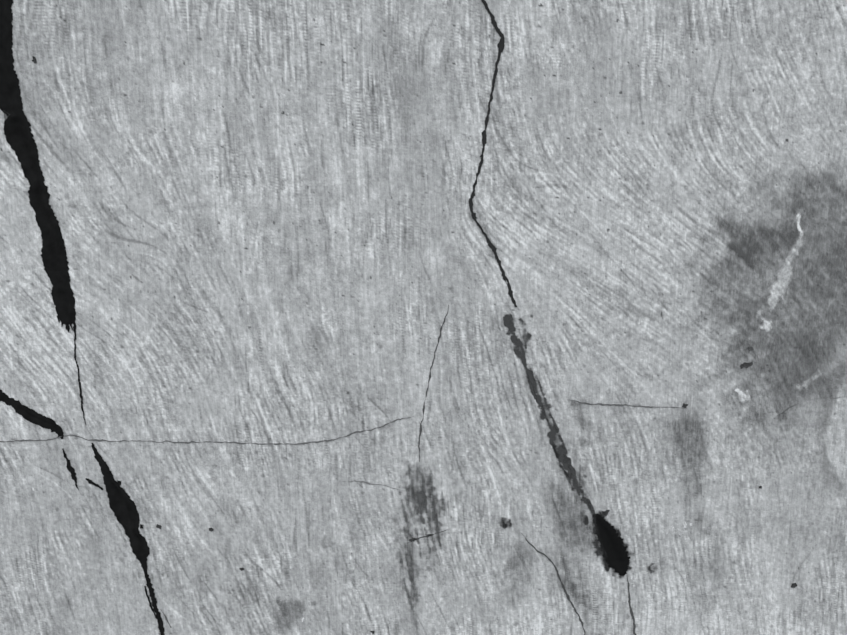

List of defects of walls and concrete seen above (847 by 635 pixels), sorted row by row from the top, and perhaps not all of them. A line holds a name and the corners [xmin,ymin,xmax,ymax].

crack [0,0,449,635]
crack [468,0,679,525]
crack [521,533,586,635]
crack [627,577,636,635]